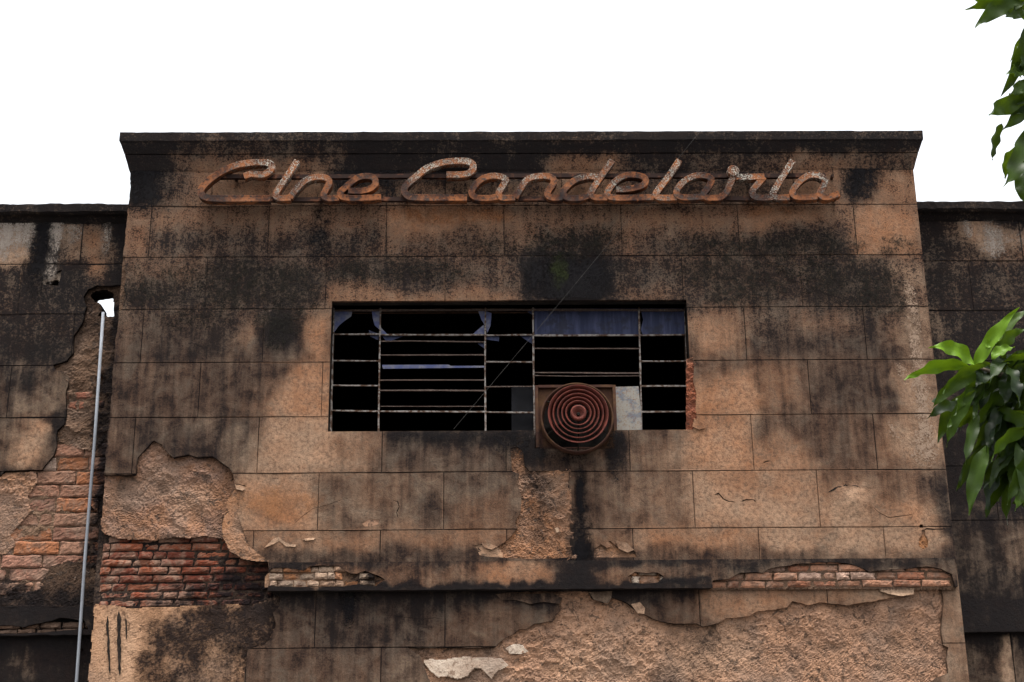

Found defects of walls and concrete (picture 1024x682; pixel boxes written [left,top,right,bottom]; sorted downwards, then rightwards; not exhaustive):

damp [0,222,82,294]
damp [121,207,629,350]
rust [686,357,707,430]
flaking render [0,257,383,682]
flaking render [475,447,577,560]
damp [567,468,594,560]
flaking render [409,562,951,682]